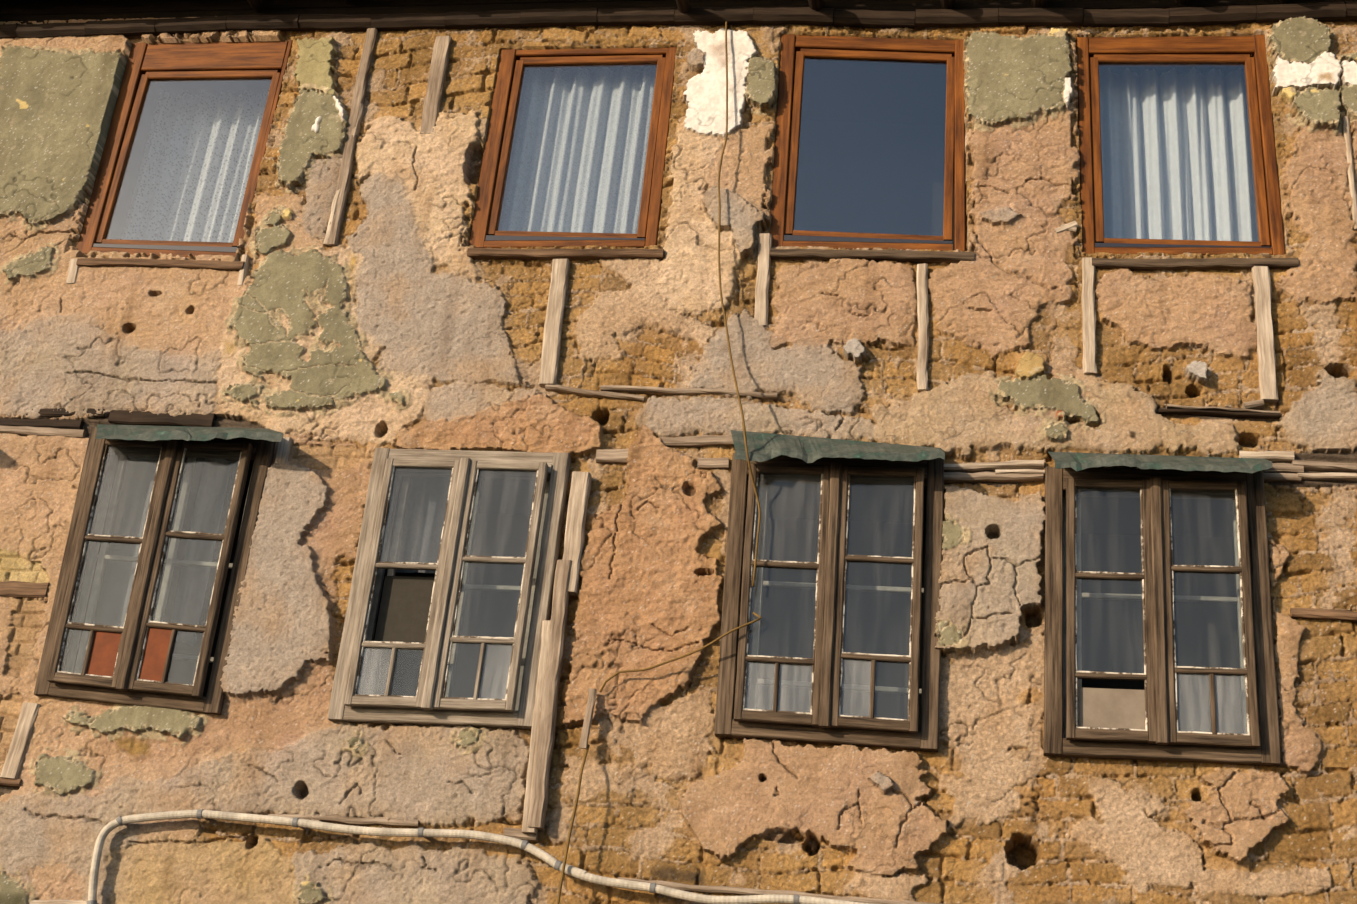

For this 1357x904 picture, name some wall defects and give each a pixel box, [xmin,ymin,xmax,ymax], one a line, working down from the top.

spalling [469,216,552,384]
spalling [561,258,721,390]
spalling [768,246,850,350]
spalling [829,260,935,391]
spalling [995,268,1260,440]
spalling [1270,278,1357,407]
crack [941,545,1041,638]
spalling [528,451,859,904]
spalling [1002,482,1357,904]
crack [772,741,799,796]
crack [838,786,936,848]
crack [1203,770,1281,847]